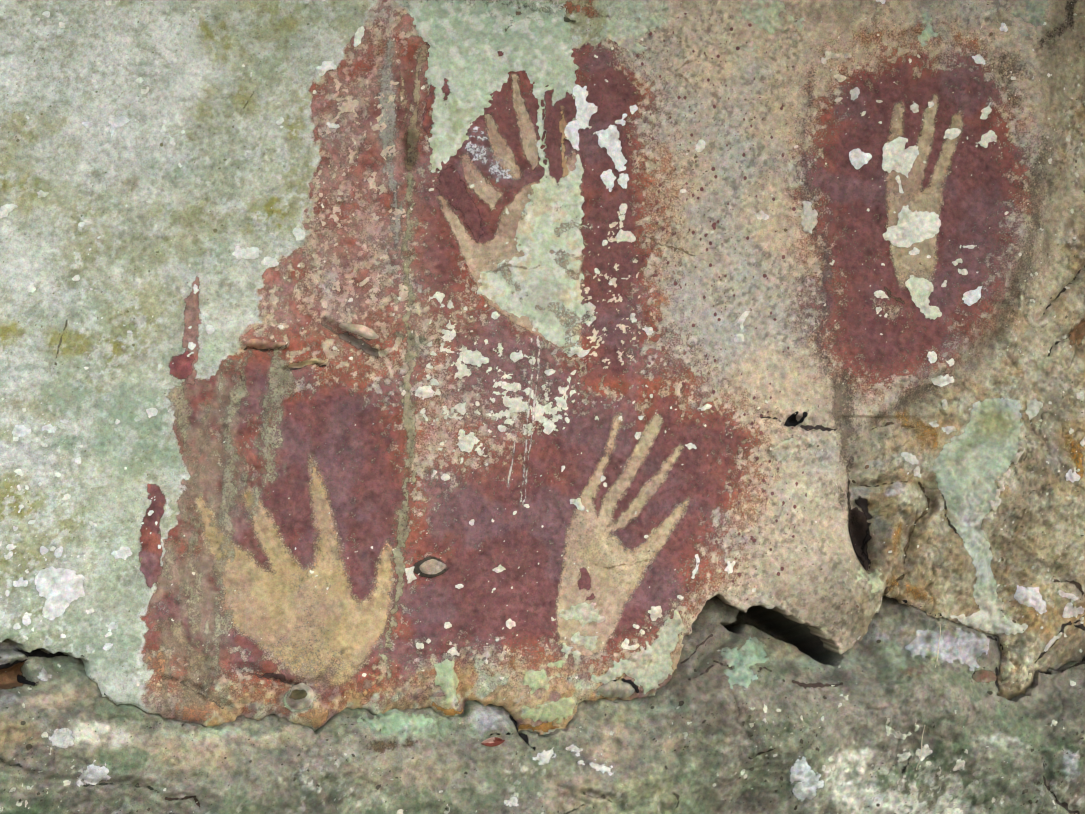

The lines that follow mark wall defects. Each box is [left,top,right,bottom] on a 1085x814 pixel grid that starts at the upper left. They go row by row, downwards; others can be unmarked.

peeling [422,78,451,137]
peeling [564,85,638,192]
peeling [943,128,961,140]
peeling [849,136,941,258]
spalling [574,203,654,369]
peeling [905,276,947,320]
peeling [962,286,982,306]
spalling [400,291,579,473]
crack [1035,579,1085,675]
crack [0,649,139,706]
crack [681,634,730,680]
crack [758,667,843,689]